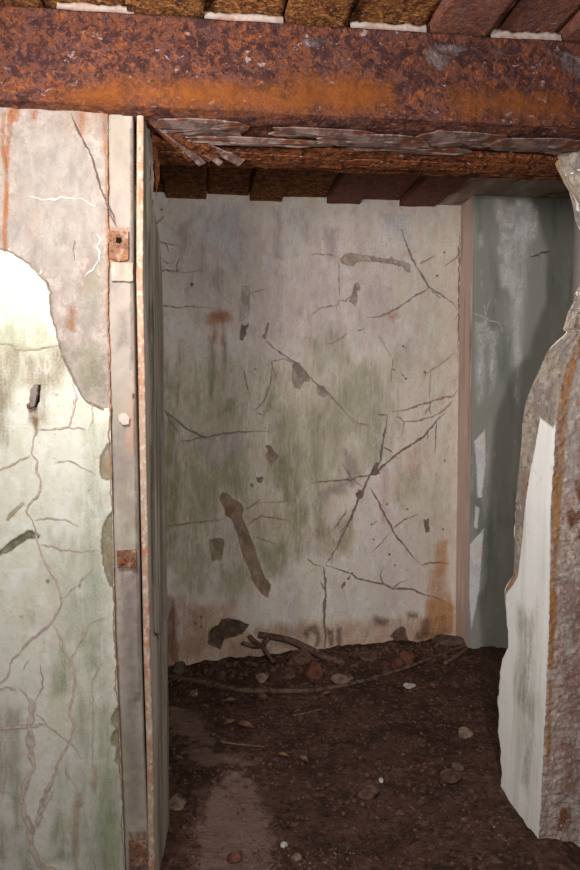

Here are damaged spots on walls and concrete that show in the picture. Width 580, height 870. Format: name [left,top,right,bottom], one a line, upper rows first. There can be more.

corrosion [2,109,18,252]
flaking render [0,107,110,410]
crack [0,382,110,828]
crack [71,114,117,227]
corrosion [105,114,128,533]
corrosion [112,549,147,870]
leakage [159,375,453,760]
crack [163,231,510,649]
corrosion [425,42,466,70]
flaking render [469,429,487,627]
spalling [505,286,580,847]
spalling [555,150,580,227]